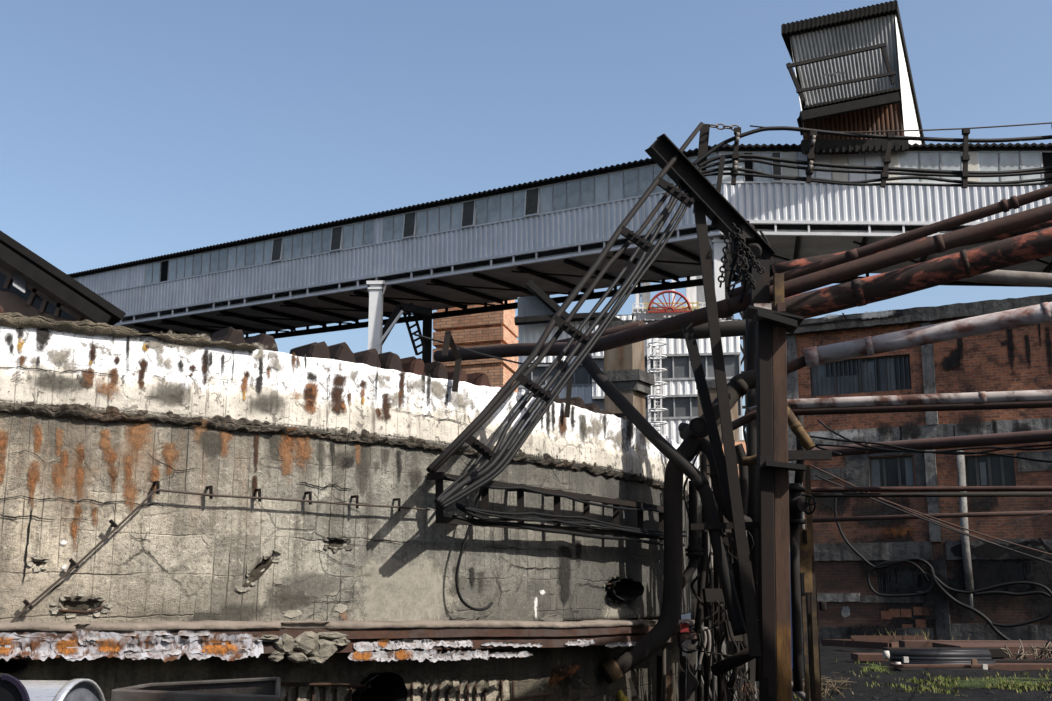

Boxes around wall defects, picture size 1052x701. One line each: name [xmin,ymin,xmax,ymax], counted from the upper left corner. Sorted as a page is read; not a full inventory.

corrosion [79,342,98,388]
corrosion [138,344,149,388]
corrosion [292,352,318,414]
corrosion [330,373,367,414]
water stain [1001,323,1052,375]
crack [298,482,353,492]
crack [0,495,168,584]
spalling [235,549,282,592]
crack [303,537,419,621]
water stain [558,540,582,604]
spalling [50,593,113,618]
peeling [0,630,283,674]